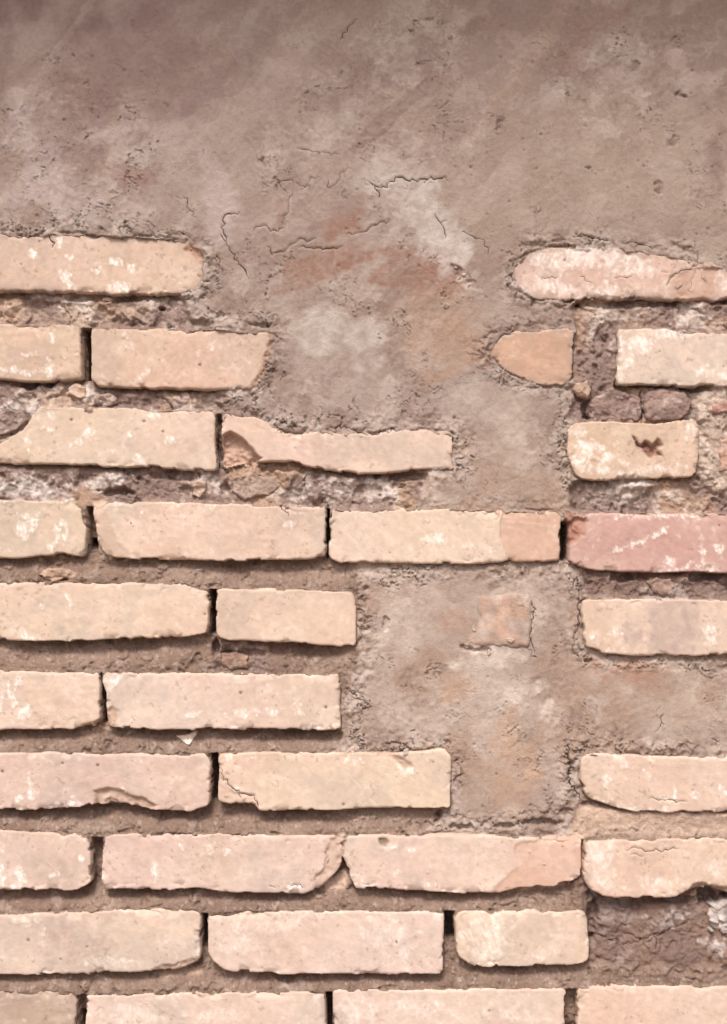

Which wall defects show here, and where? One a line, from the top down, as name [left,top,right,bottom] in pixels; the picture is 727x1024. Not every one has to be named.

crack [214,149,448,278]
crack [435,215,489,253]
spalling [222,428,263,471]
spalling [630,433,666,462]
spalling [92,497,135,563]
spalling [562,510,589,546]
spalling [73,705,120,735]
spalling [90,784,162,810]
spalling [218,772,261,811]
spalling [310,832,350,893]
spalling [675,881,727,934]
spalling [150,951,205,980]